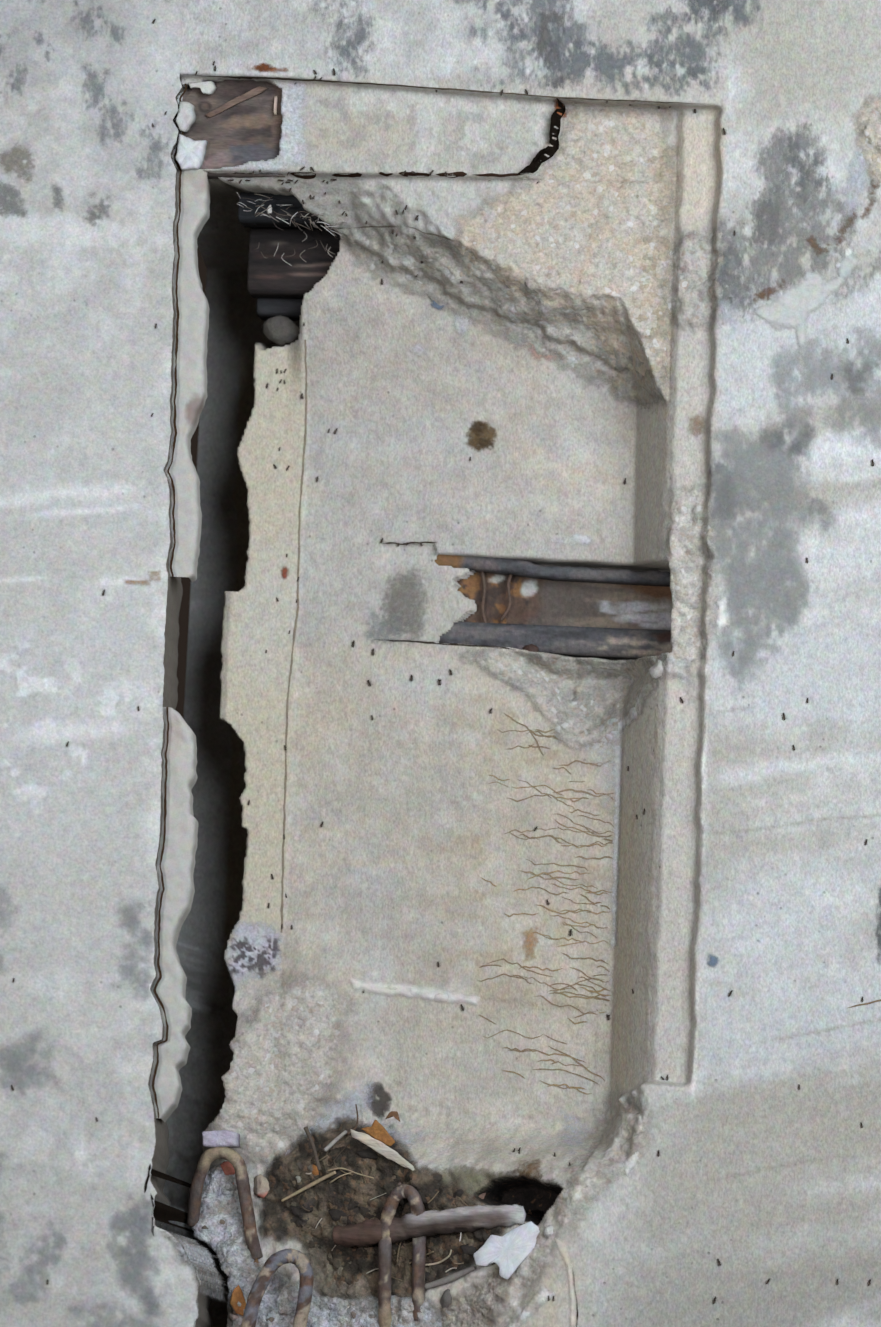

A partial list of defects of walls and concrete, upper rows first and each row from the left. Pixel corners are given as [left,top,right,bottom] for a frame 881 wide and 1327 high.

water stain [340,18,369,74]
water stain [483,0,760,92]
spalling [335,99,724,404]
water stain [716,125,867,319]
crack [144,75,701,1327]
spalling [463,486,728,749]
water stain [711,417,826,674]
spalling [491,1091,650,1327]